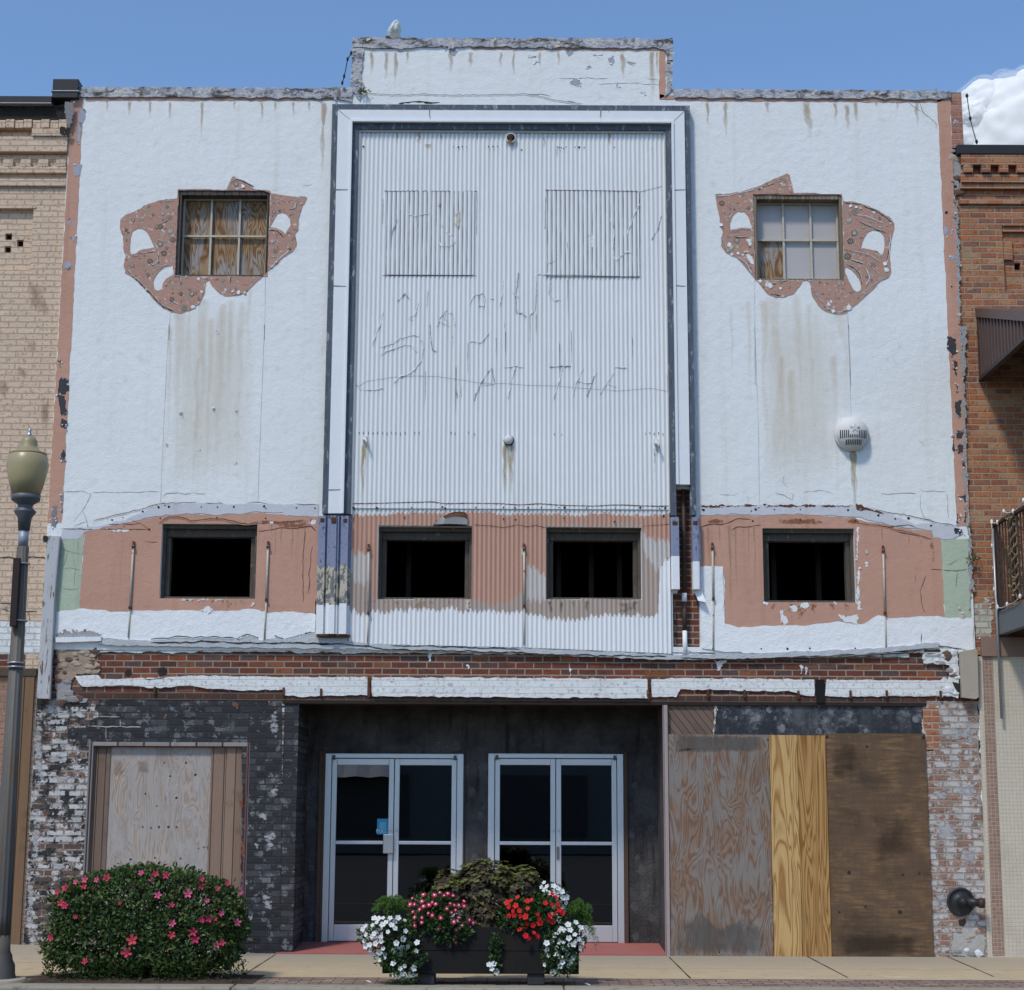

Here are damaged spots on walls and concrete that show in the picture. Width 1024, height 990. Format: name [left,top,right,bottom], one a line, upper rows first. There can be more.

peeling [396,37,675,88]
peeling [56,360,69,430]
spalling [943,147,994,639]
corrosion [503,437,514,468]
peeling [701,504,883,514]
peeling [834,527,868,624]
peeling [780,602,809,625]
spalling [951,918,985,957]